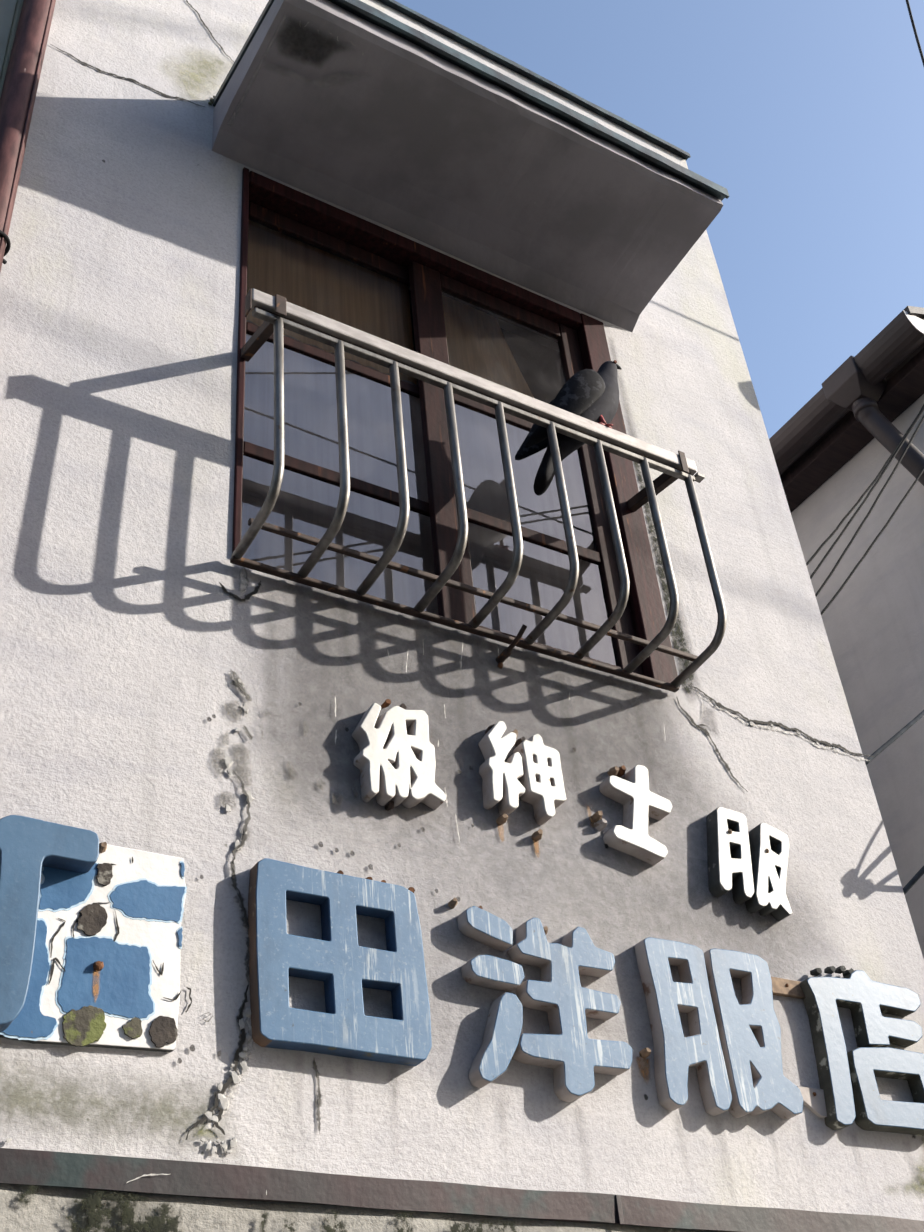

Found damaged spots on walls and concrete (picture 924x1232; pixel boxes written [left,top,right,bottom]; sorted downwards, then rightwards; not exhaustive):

crack [186,0,234,62]
water stain [274,21,363,65]
crack [50,44,205,107]
crack [230,669,253,740]
crack [676,685,874,792]
crack [186,770,253,1140]
water stain [18,1185,38,1205]
water stain [65,1190,183,1232]
water stain [260,1212,268,1232]
water stain [322,1211,347,1232]
water stain [395,1213,413,1232]
water stain [449,1221,517,1232]